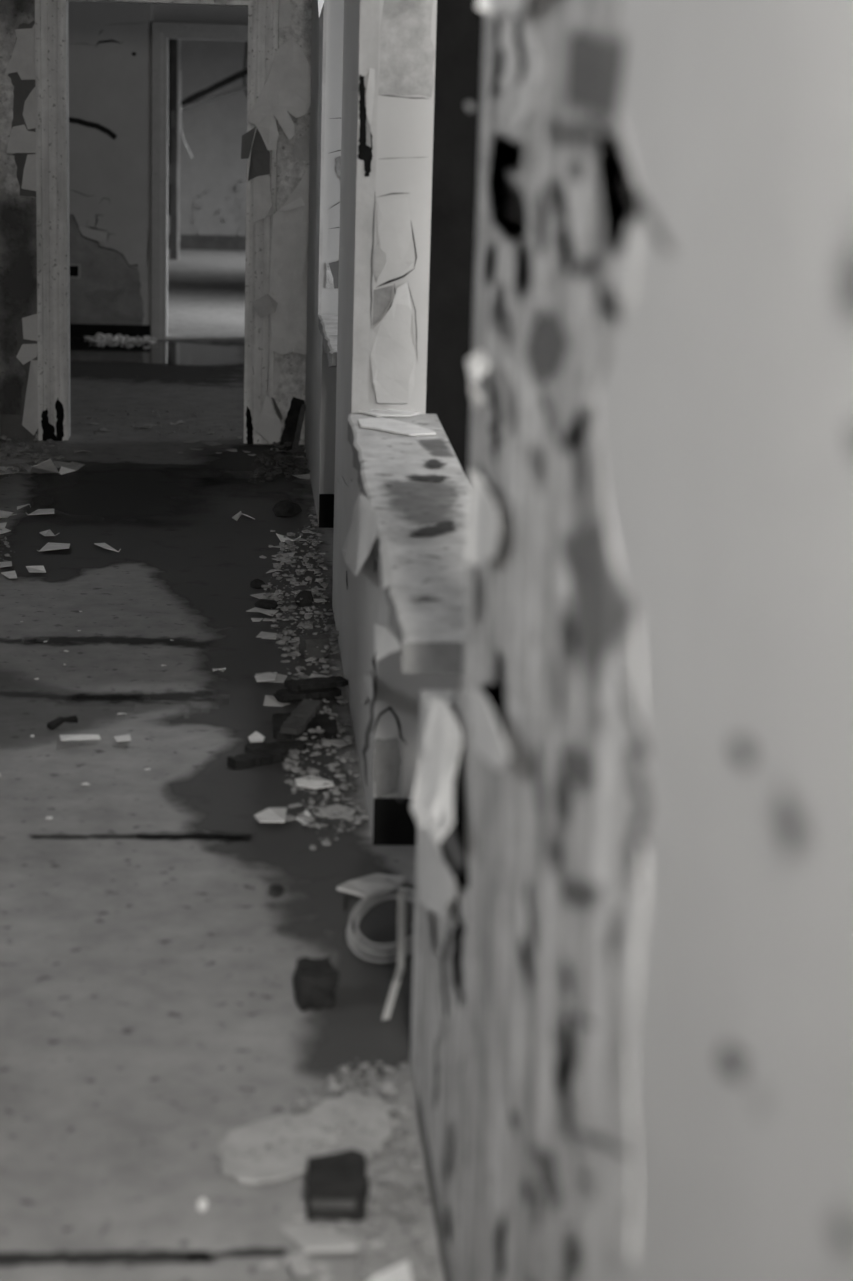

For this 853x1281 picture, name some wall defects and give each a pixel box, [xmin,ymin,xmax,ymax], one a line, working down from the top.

peeling [378,0,435,99]
peeling [5,21,36,197]
spalling [69,214,144,343]
peeling [15,313,38,435]
peeling [358,410,436,436]
peeling [337,476,395,590]
peeling [396,0,672,1281]
peeling [248,731,265,743]
peeling [295,775,334,789]
peeling [361,624,402,786]
peeling [279,1222,357,1254]
peeling [369,1260,412,1281]